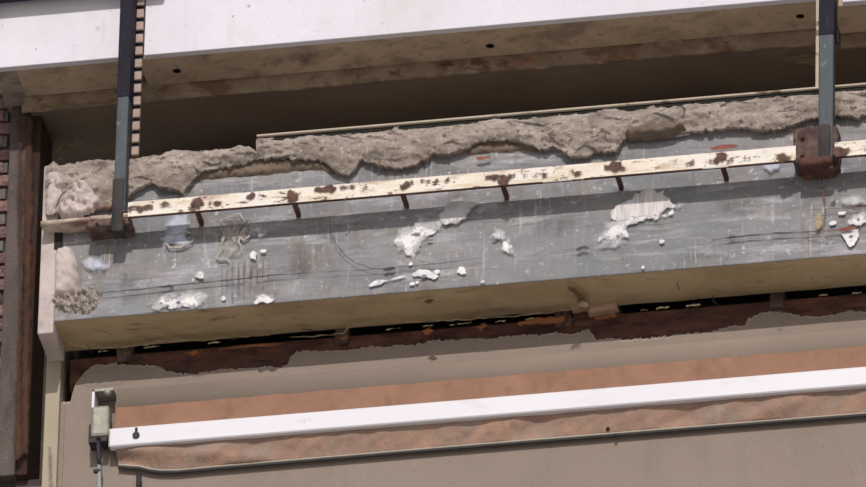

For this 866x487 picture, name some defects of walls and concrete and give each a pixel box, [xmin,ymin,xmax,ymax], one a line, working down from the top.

spalling [128,94,819,199]
corrosion [709,144,751,163]
spalling [44,159,115,219]
corrosion [126,201,171,212]
corrosion [190,196,221,209]
corrosion [314,184,367,201]
corrosion [400,177,450,189]
corrosion [485,172,548,186]
peeling [599,188,681,248]
peeling [829,211,866,247]
peeling [369,217,443,287]
peeling [152,271,208,310]